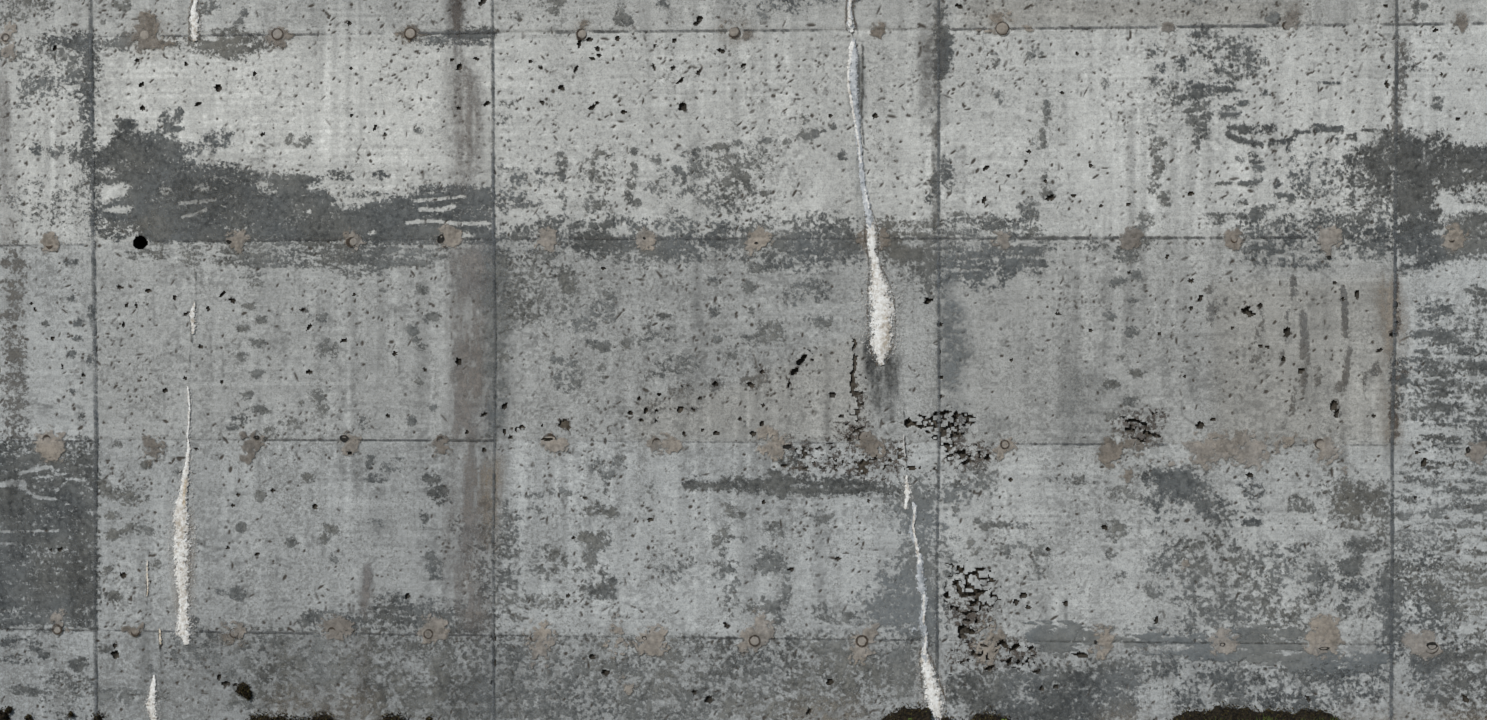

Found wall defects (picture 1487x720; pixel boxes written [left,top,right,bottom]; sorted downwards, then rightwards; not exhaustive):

crack [143,254,202,720]
damp [0,0,451,442]
peeling [163,408,1487,720]
peeling [682,338,1002,500]
crack [842,0,950,720]